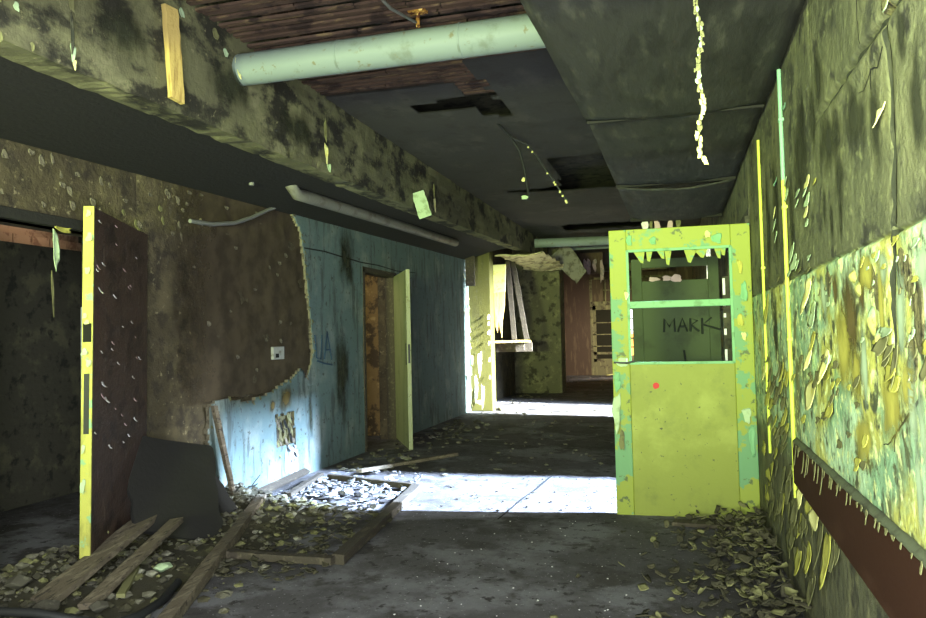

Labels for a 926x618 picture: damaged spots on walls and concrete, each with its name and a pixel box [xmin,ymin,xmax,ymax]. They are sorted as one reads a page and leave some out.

peeling [705,230,722,244]
peeling [772,174,816,243]
flaking render [158,186,491,581]